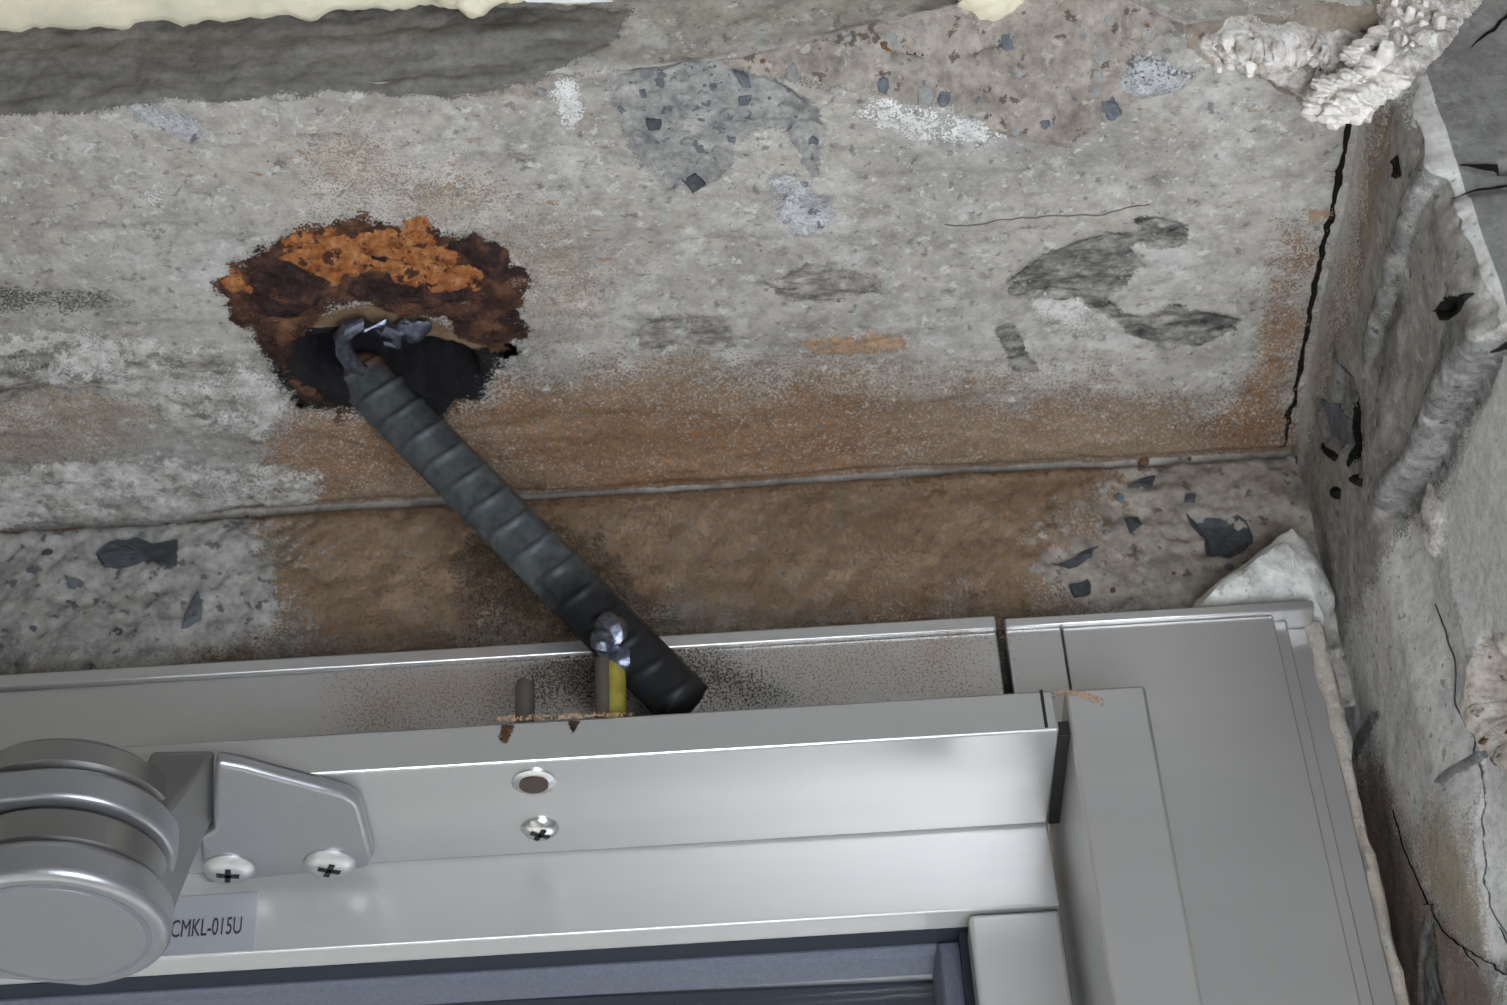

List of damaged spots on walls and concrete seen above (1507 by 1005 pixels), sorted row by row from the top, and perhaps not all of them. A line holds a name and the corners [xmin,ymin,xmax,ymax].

crack [1471,14,1507,49]
corrosion [166,105,671,743]
corrosion [517,208,1340,711]
spalling [473,0,1507,1005]
crack [1279,124,1352,448]
crack [1392,604,1507,975]